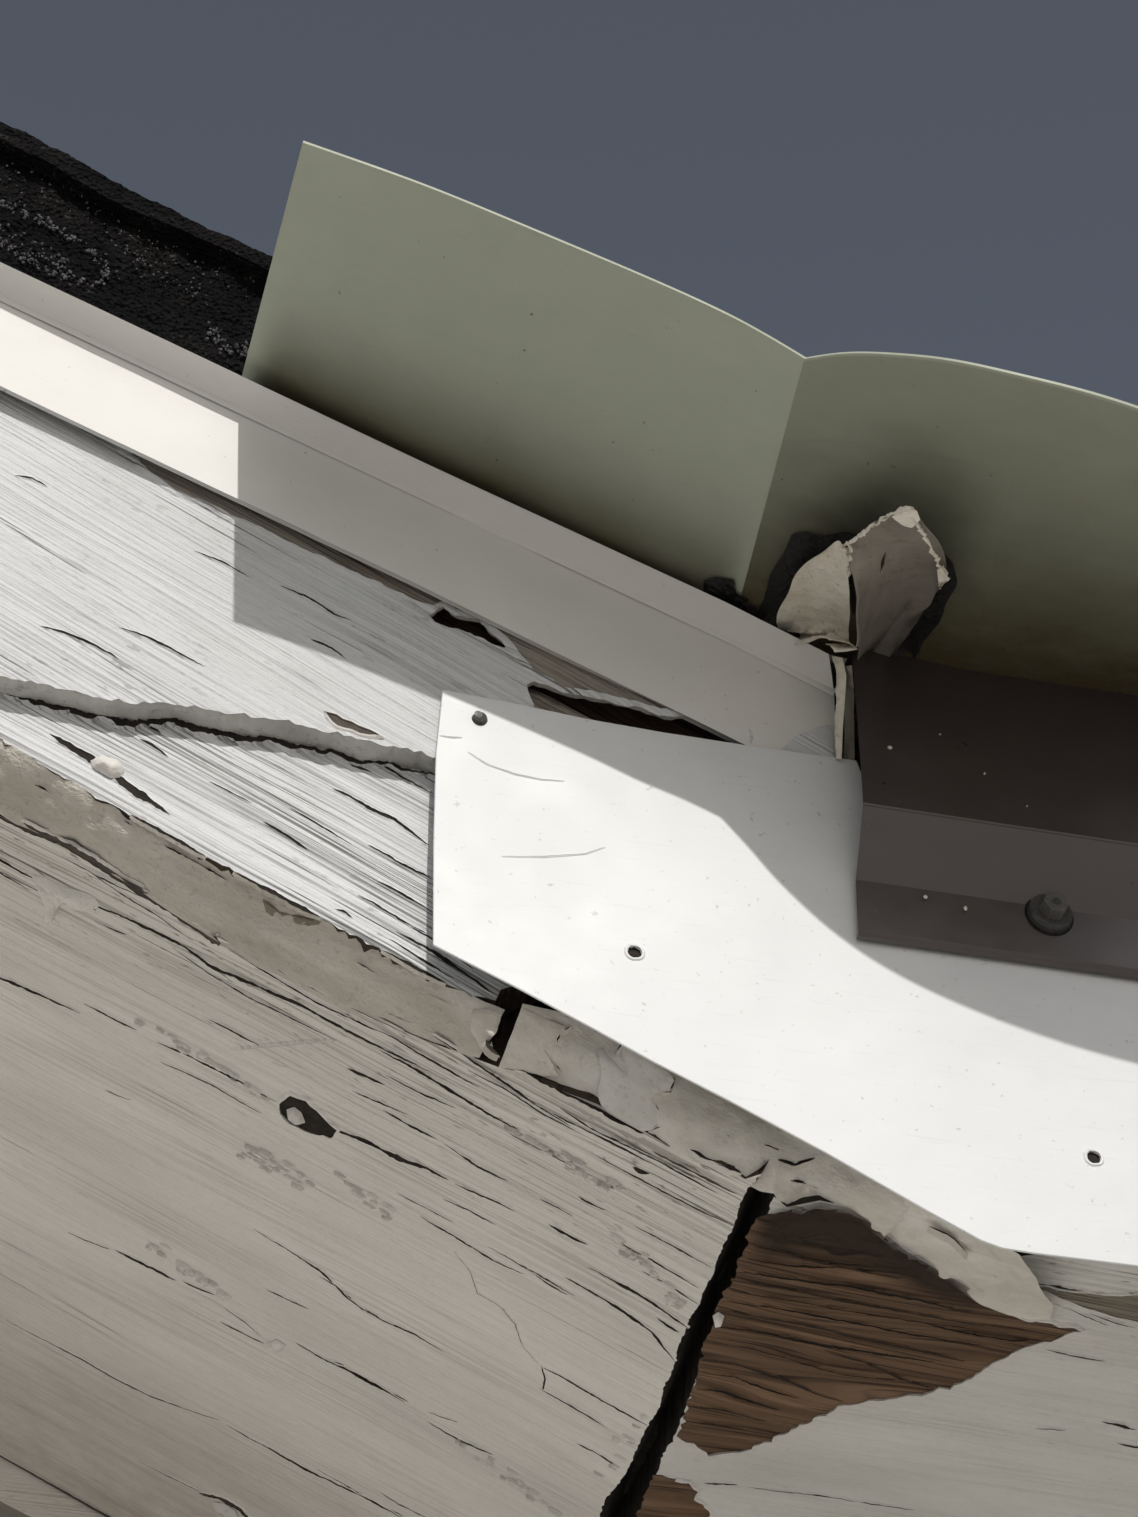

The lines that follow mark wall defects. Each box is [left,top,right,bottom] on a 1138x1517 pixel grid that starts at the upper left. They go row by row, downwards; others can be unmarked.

peeling [892,510,920,528]
peeling [112,443,687,717]
peeling [323,710,385,740]
peeling [471,1009,501,1050]
peeling [522,1009,572,1076]
crack [0,693,1138,1464]
peeling [597,1044,676,1138]
peeling [286,1107,305,1125]
peeling [677,1202,1138,1457]
peeling [636,1475,714,1517]
crack [704,1481,915,1511]